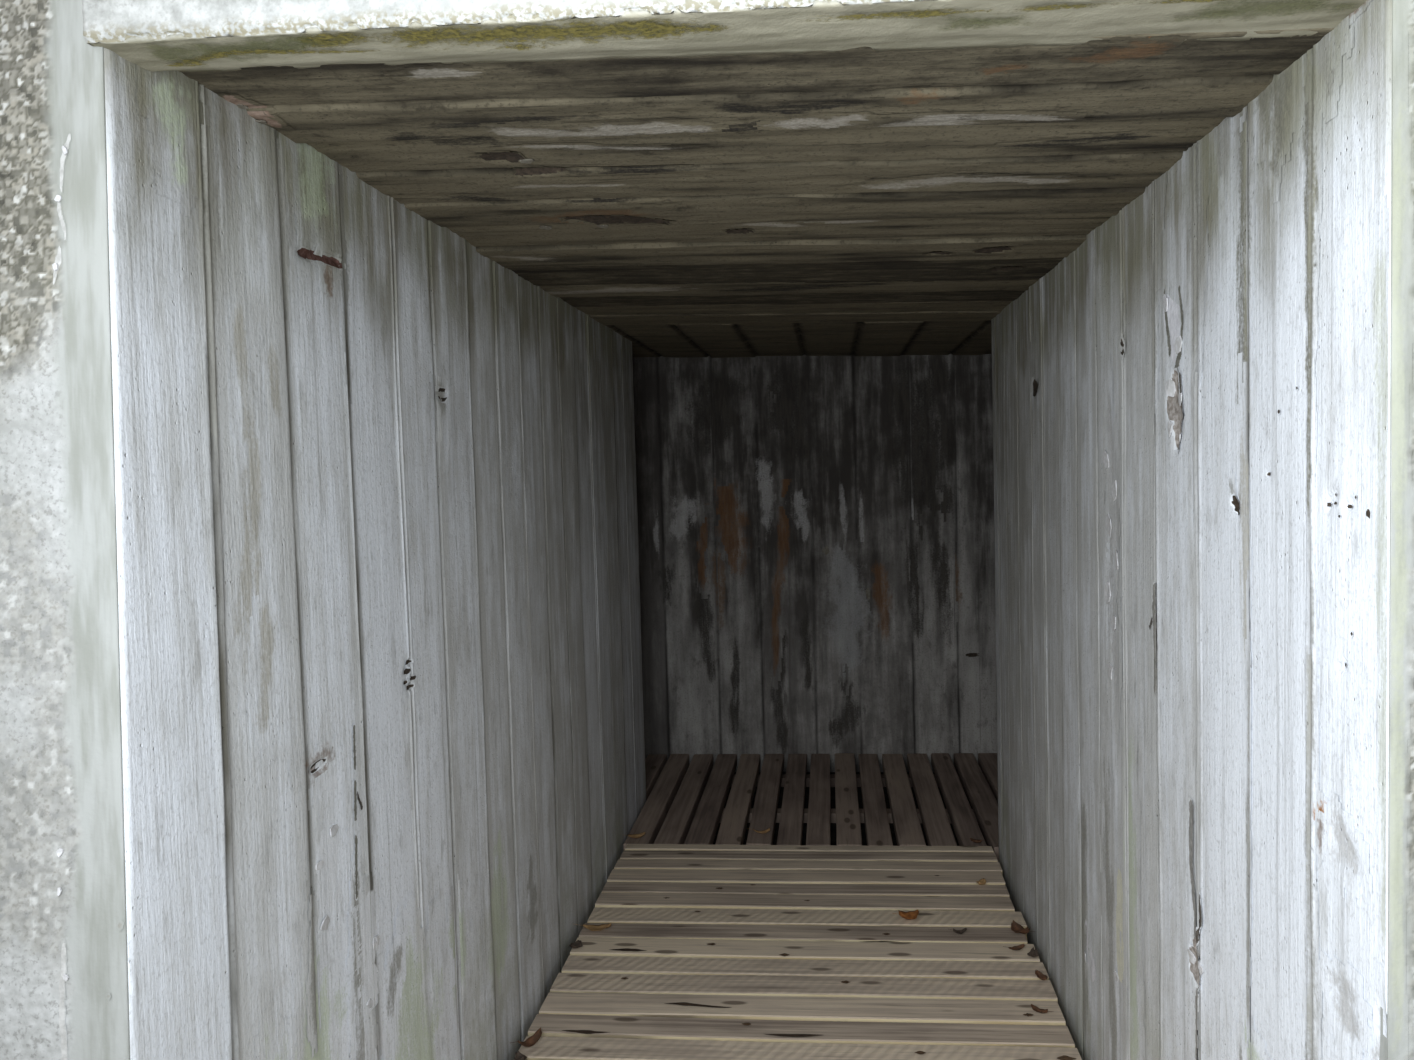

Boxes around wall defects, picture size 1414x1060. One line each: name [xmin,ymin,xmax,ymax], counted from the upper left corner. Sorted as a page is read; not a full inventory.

peeling [1161,284,1184,453]
water stain [358,15,1354,1060]
water stain [306,885,321,1058]
water stain [347,854,371,1060]